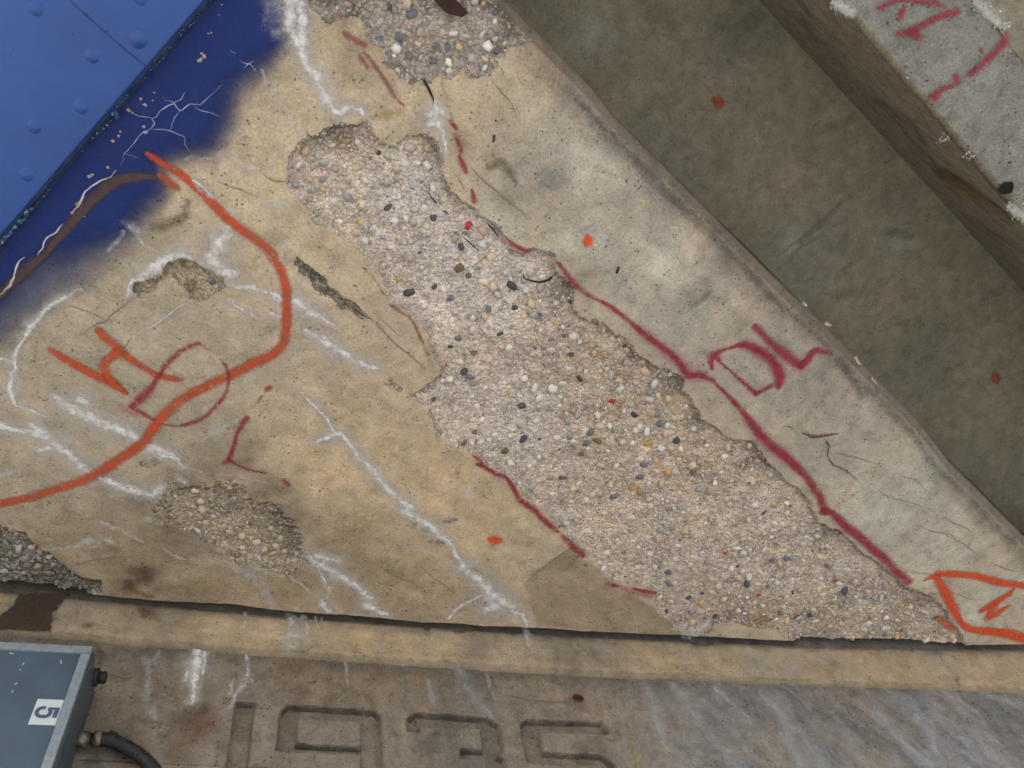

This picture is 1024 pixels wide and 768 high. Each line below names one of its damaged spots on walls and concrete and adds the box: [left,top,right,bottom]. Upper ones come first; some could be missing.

spalling [307,0,529,86]
crack [0,93,221,295]
spalling [132,258,226,302]
spalling [285,118,967,645]
crack [783,426,877,479]
spalling [0,525,101,594]
spalling [148,475,311,577]
crack [879,475,1013,571]